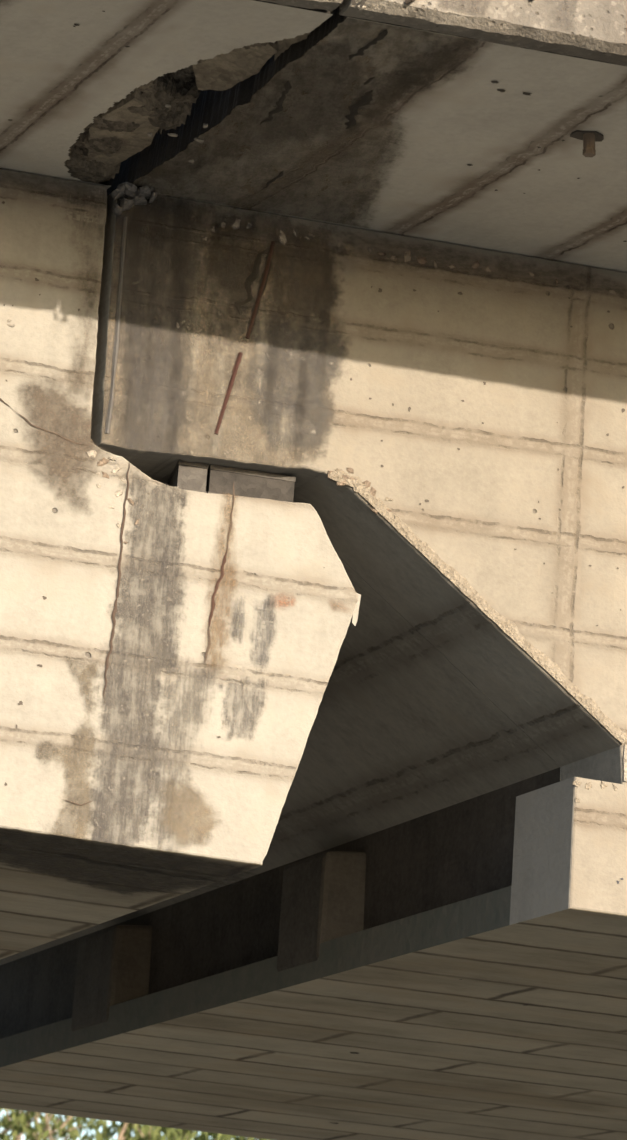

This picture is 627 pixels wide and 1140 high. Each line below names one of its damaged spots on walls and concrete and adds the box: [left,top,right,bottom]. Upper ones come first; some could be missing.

spalling [64,24,321,216]
crack [260,81,292,125]
crack [345,30,388,129]
water stain [24,17,626,505]
crack [0,398,89,446]
crack [103,461,130,702]
water stain [0,479,265,894]
crack [204,484,235,663]
water stain [232,597,275,666]
spalling [327,468,397,528]